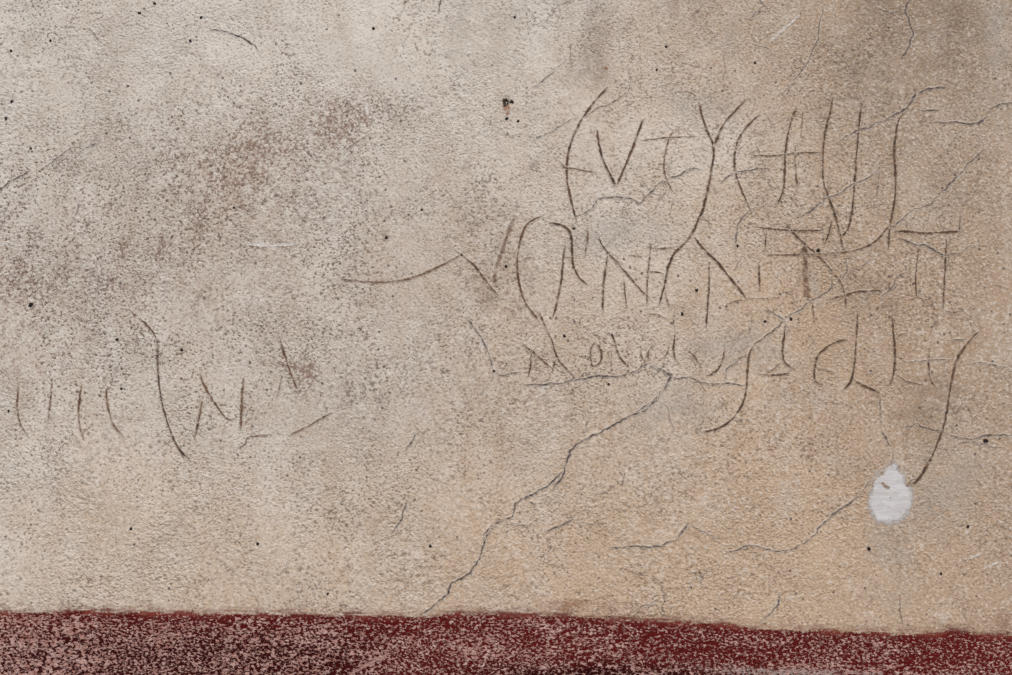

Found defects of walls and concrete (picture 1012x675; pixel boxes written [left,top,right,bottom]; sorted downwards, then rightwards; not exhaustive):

crack [778,5,825,100]
crack [873,0,915,59]
crack [532,116,577,141]
crack [580,166,770,217]
crack [801,164,884,218]
crack [836,85,1012,258]
crack [733,206,757,271]
crack [422,255,1012,616]
crack [760,592,781,622]